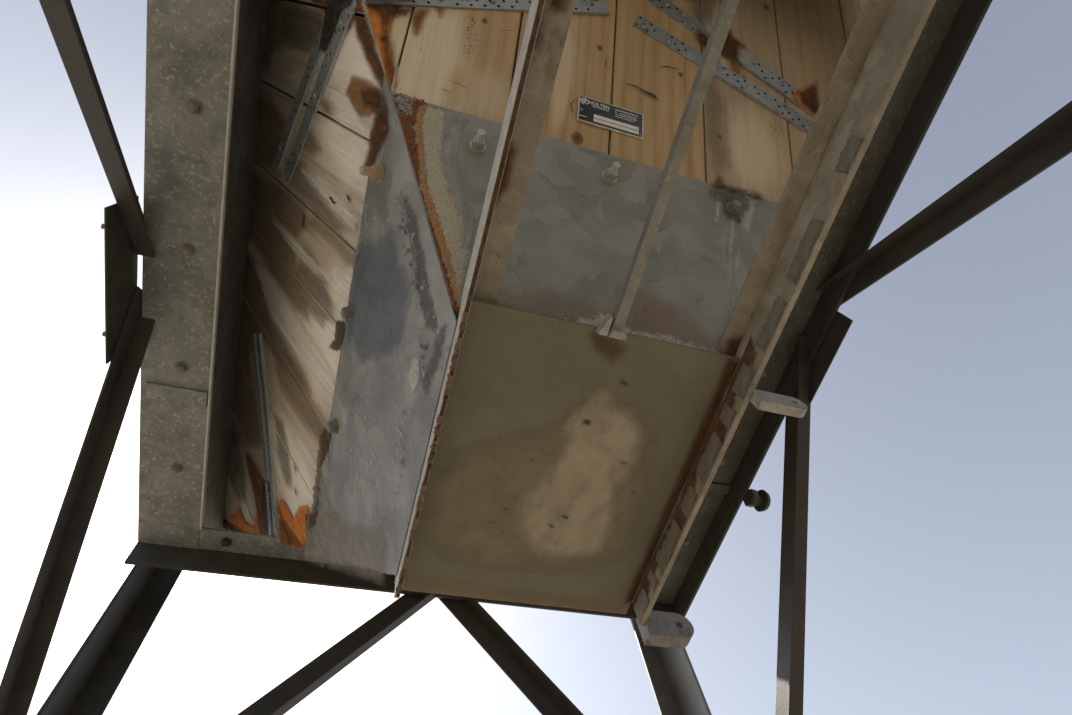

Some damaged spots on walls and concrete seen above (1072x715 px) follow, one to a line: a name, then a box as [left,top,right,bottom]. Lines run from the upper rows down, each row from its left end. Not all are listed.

corrosion [718,29,745,72]
corrosion [793,84,819,113]
corrosion [311,0,565,597]
corrosion [223,427,331,549]
water stain [424,401,643,567]